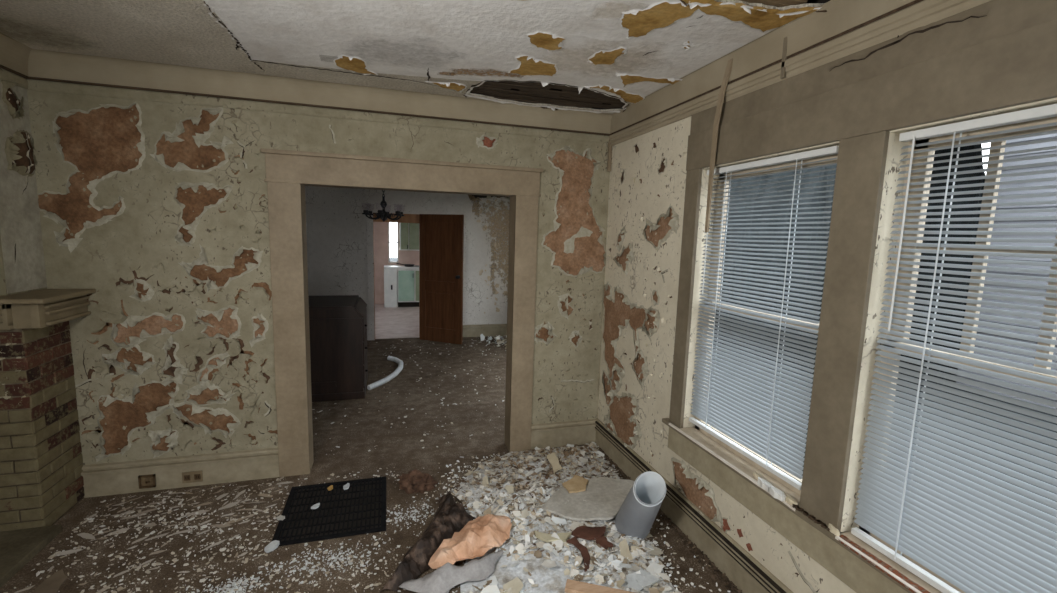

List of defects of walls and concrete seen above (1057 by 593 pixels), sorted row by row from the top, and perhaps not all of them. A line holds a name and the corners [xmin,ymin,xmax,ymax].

peeling [424,0,822,113]
peeling [37,102,278,463]
peeling [534,142,687,457]
peeling [671,457,764,561]